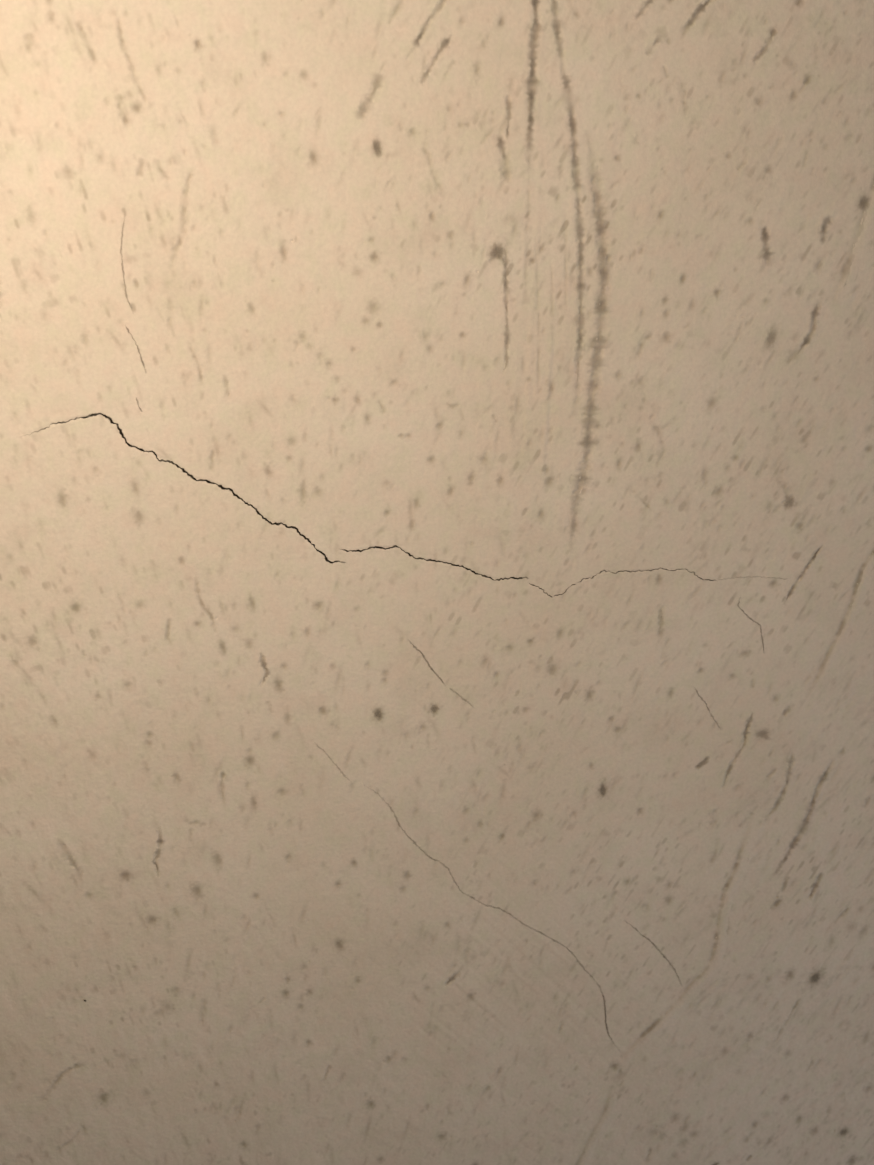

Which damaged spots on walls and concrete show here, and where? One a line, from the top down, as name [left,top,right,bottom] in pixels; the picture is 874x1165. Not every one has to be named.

crack [45,413,714,597]